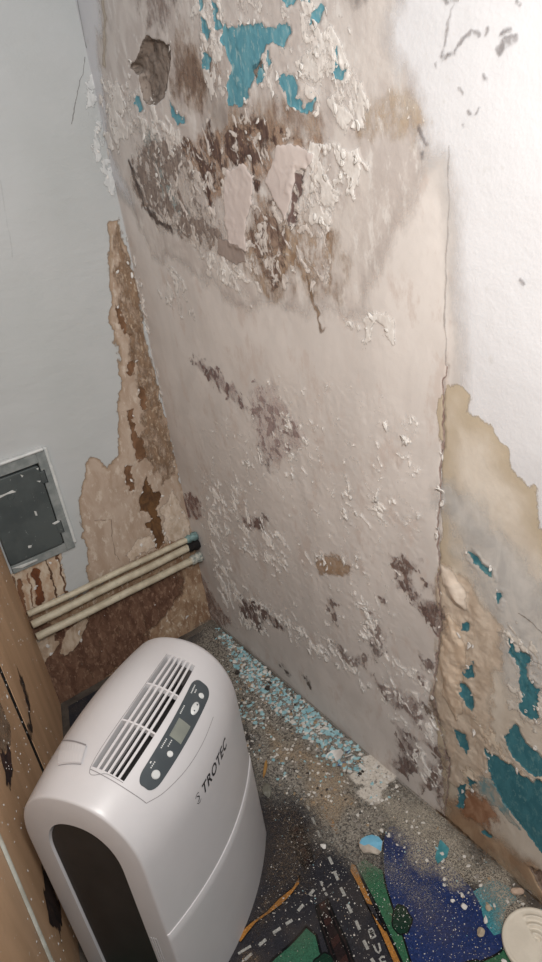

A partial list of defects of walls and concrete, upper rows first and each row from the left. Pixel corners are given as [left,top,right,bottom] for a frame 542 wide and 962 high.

flaking render [85,0,371,308]
water stain [79,220,189,582]
flaking render [124,387,190,561]
water stain [97,0,542,903]
water stain [17,668,33,739]
peeling [36,616,89,662]
water stain [27,544,196,640]
water stain [45,563,211,704]
peeling [459,661,474,711]
peeling [508,637,541,724]
peeling [484,724,542,853]
water stain [42,866,62,938]